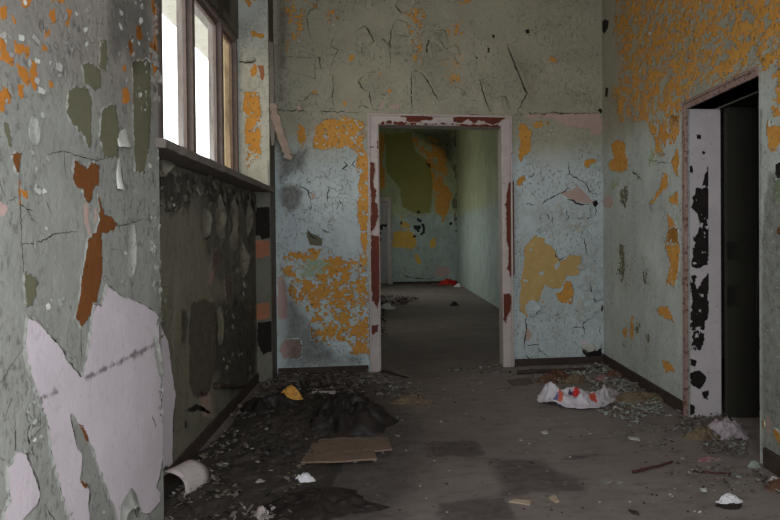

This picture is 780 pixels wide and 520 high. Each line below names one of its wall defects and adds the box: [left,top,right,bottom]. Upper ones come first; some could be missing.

crack [48,150,114,172]
flaking render [0,0,270,520]
peeling [216,0,505,379]
peeling [503,174,582,341]
crack [527,163,597,226]
spalling [581,343,602,356]
peeling [561,139,643,219]
peeling [657,305,675,323]
peeling [602,0,780,289]
peeling [690,167,709,400]